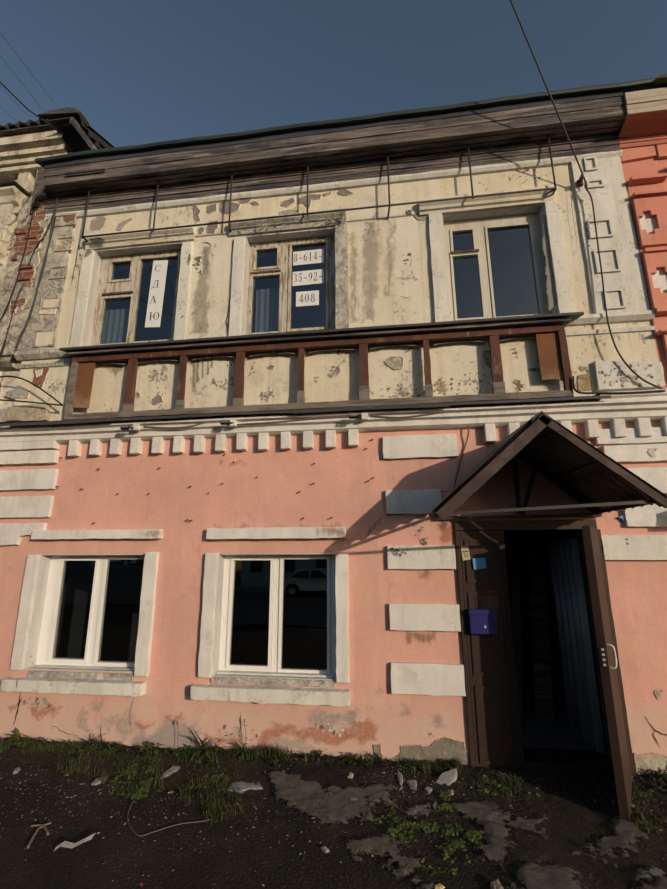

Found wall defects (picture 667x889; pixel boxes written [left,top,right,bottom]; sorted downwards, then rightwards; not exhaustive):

peeling [90,216,106,231]
peeling [192,199,260,234]
peeling [243,189,354,230]
spalling [7,196,49,287]
peeling [384,343,418,370]
peeling [381,350,491,398]
peeling [135,392,164,409]
peeling [22,697,56,716]
spalling [208,722,470,765]